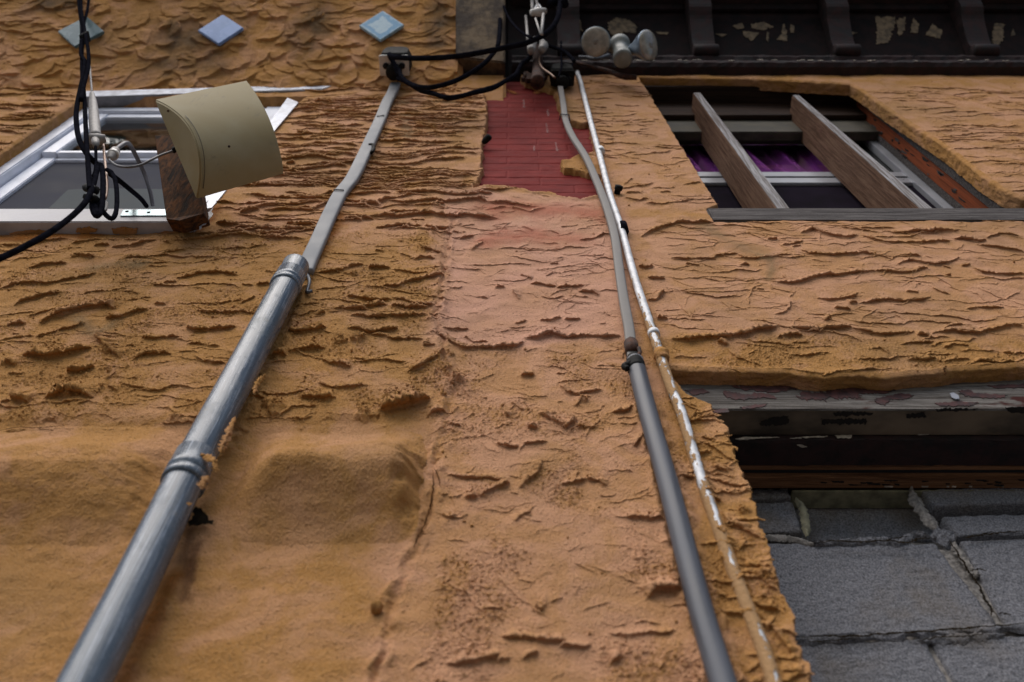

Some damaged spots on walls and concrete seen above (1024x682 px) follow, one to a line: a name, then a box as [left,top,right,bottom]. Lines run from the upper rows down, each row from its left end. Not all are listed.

peeling [715,22,795,42]
peeling [875,16,942,44]
peeling [991,23,1015,44]
spalling [479,82,597,199]
peeling [713,385,914,448]
peeling [906,384,1024,419]